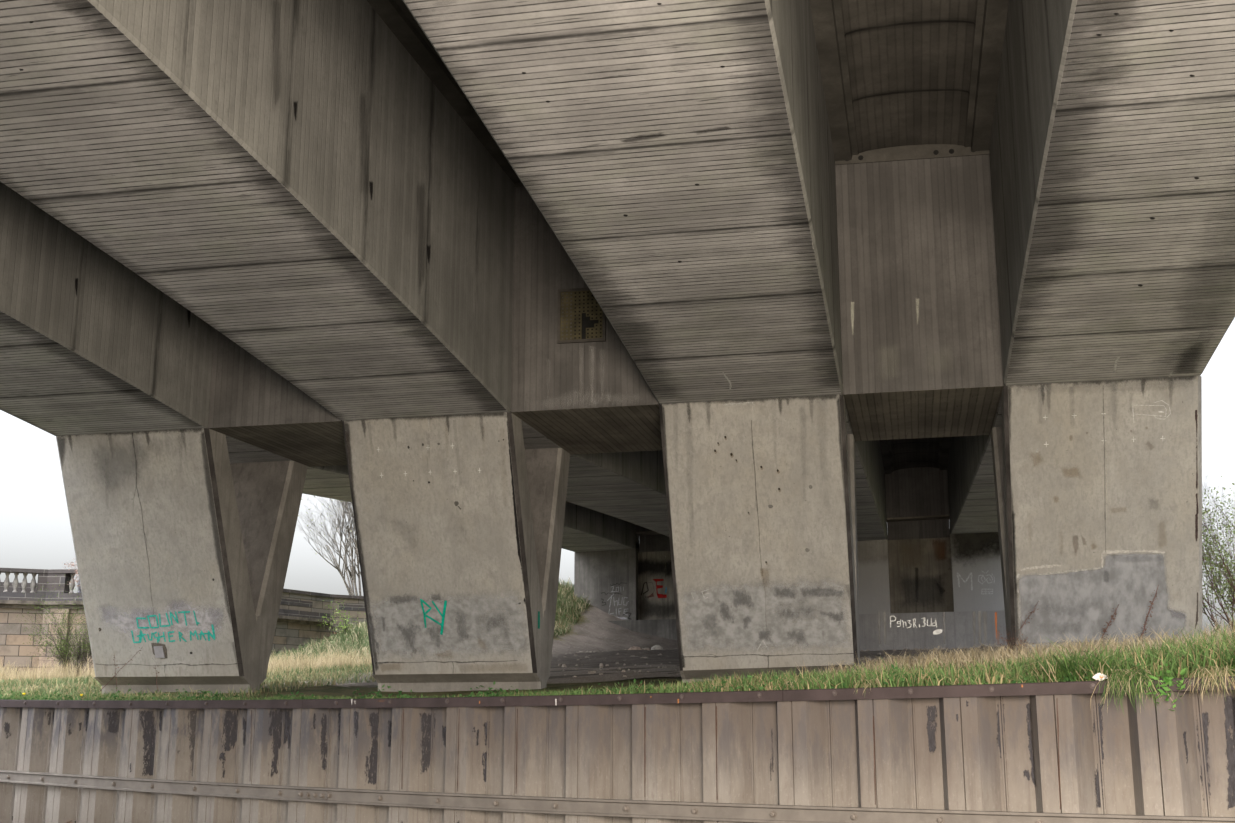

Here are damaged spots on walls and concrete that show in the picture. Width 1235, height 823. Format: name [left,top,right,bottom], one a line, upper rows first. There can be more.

crack [132,433,155,622]